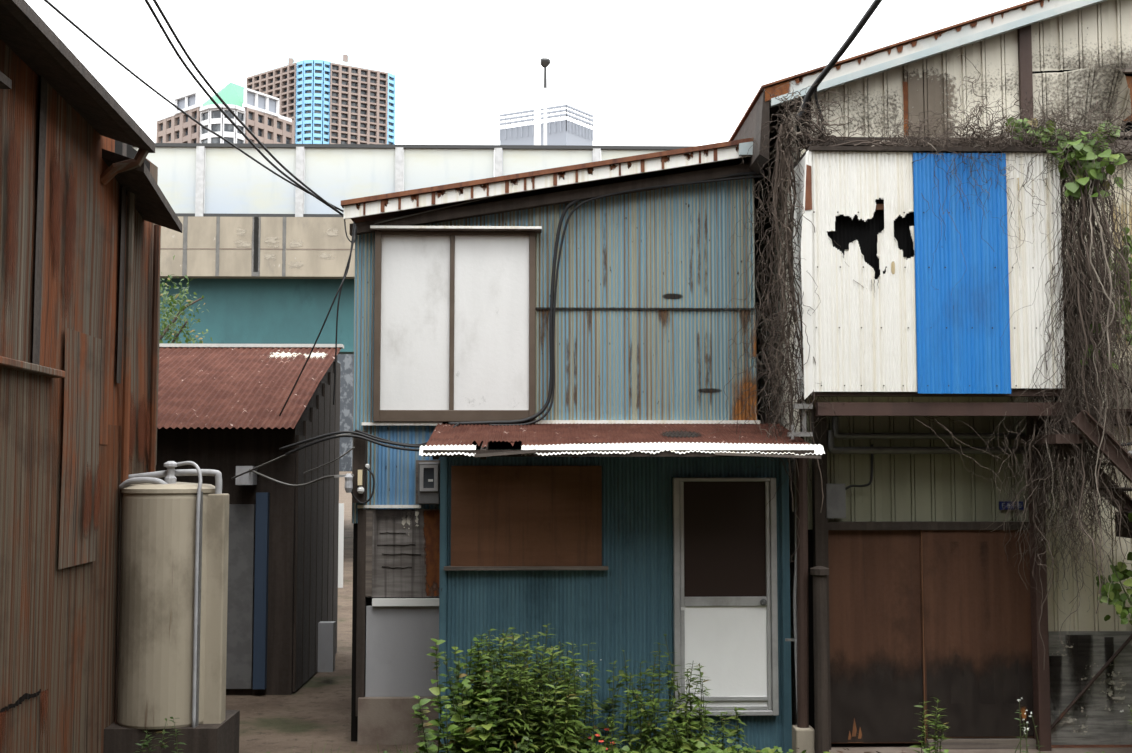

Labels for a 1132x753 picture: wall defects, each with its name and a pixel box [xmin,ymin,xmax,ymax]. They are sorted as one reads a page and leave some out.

corrosion [566,342,577,405]
corrosion [697,334,721,404]
corrosion [733,379,757,420]